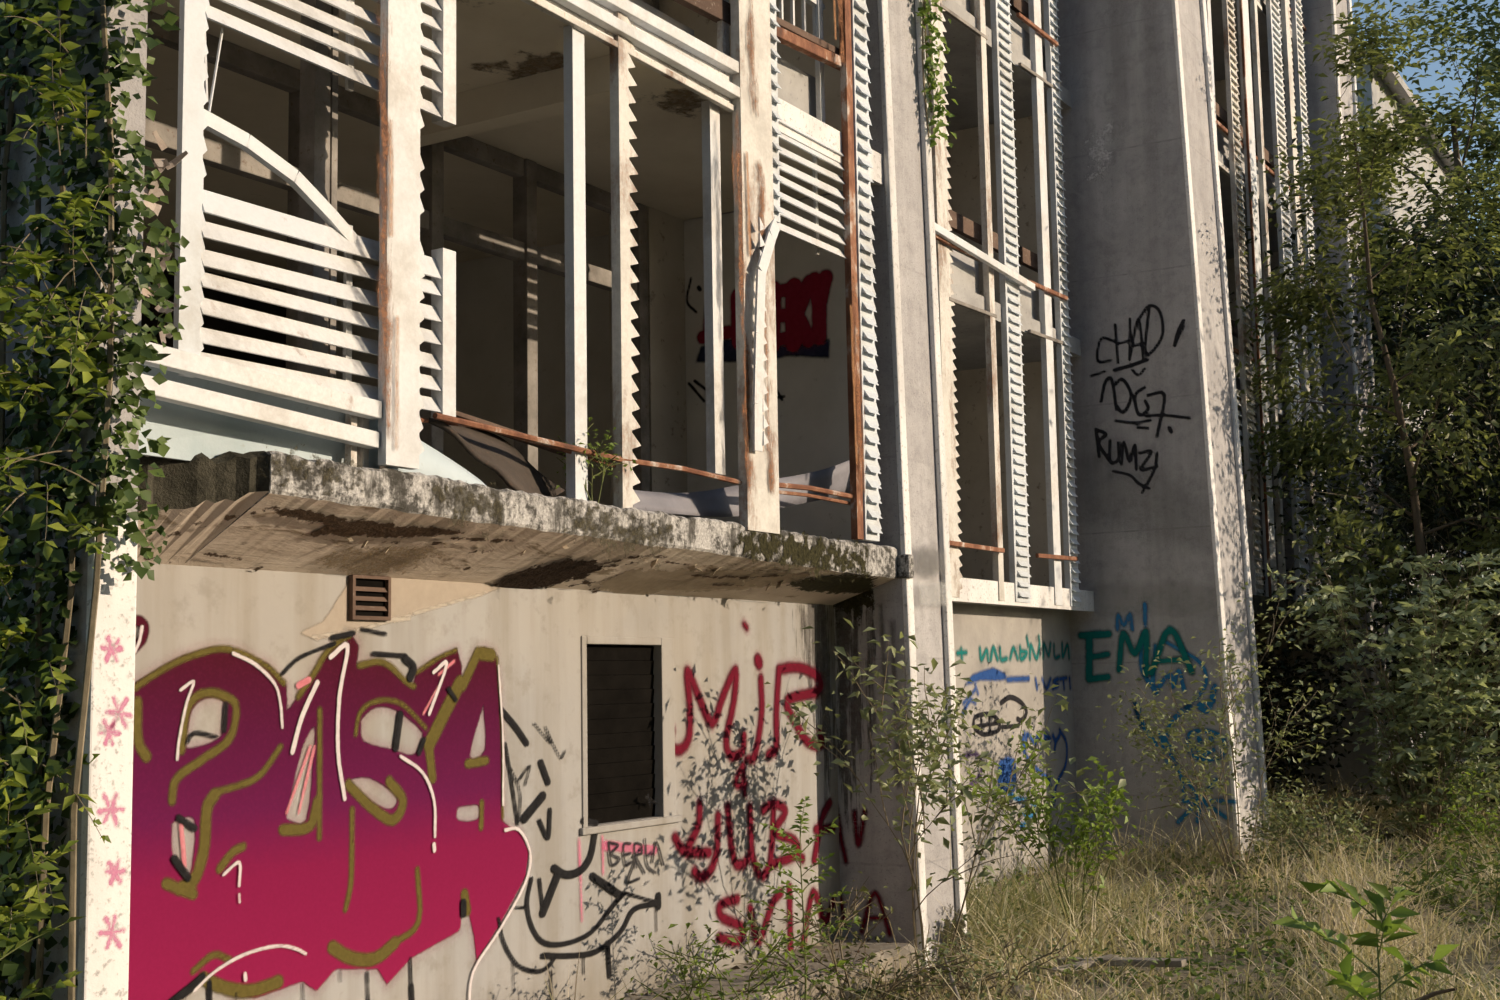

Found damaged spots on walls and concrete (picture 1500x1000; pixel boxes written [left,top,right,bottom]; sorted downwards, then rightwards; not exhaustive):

corrosion [747,4,759,115]
corrosion [833,0,845,63]
corrosion [378,21,399,448]
corrosion [732,116,775,492]
corrosion [850,276,865,490]
damp [792,596,895,828]